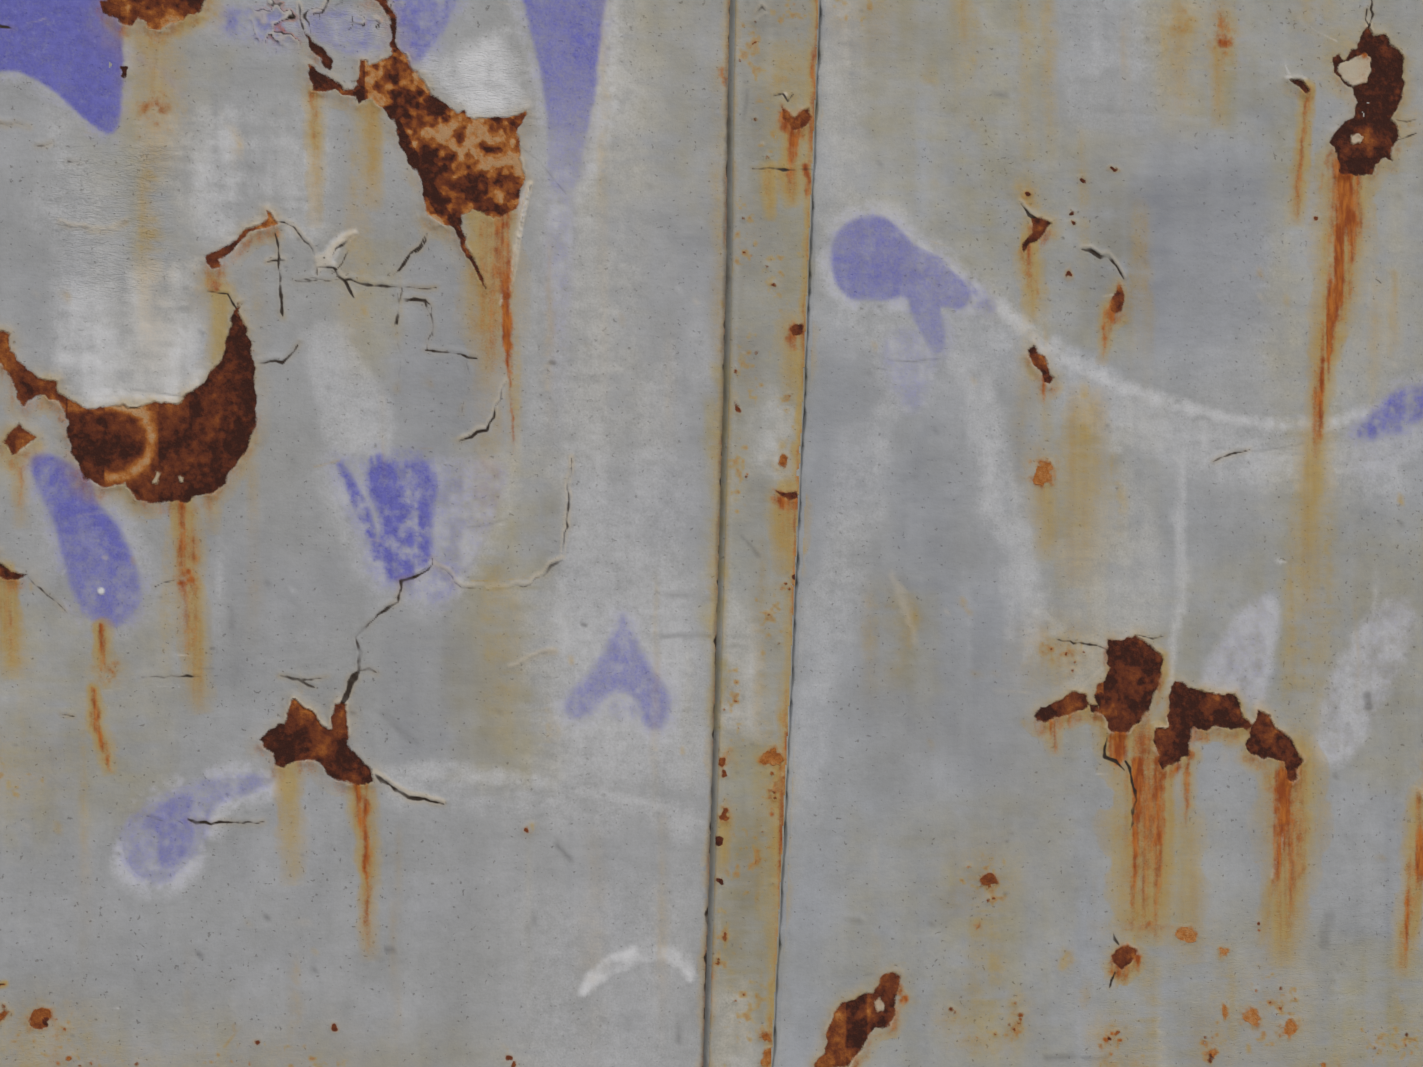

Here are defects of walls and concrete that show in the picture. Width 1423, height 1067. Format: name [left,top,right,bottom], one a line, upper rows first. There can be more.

corrosion [0,0,540,779]
crack [259,213,513,449]
crack [271,450,580,712]
corrosion [691,0,938,1067]
corrosion [1002,329,1337,1067]
corrosion [1272,1,1423,624]
corrosion [1385,743,1423,981]